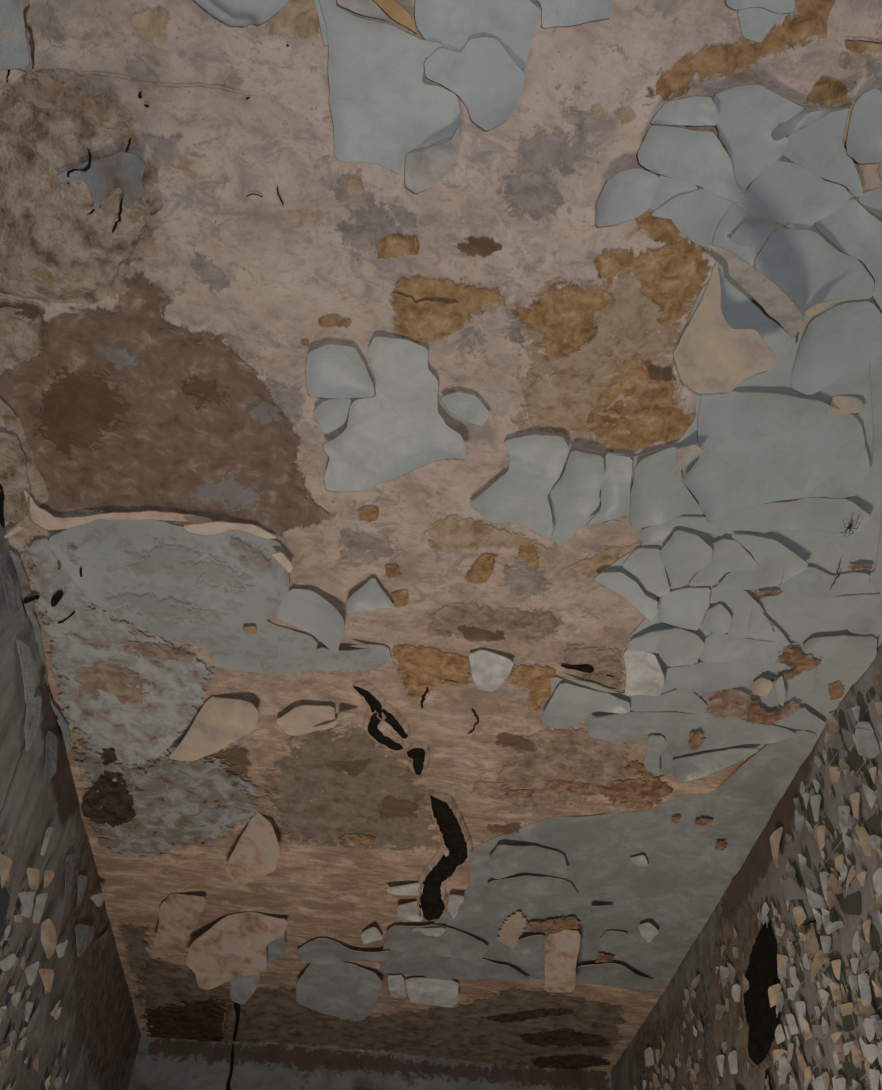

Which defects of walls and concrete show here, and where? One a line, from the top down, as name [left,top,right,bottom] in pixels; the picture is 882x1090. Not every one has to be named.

leakage [329,169,421,255]
peeling [314,0,613,193]
leakage [498,86,598,222]
rust [646,0,835,100]
rust [807,77,848,108]
rust [389,212,711,455]
peeling [0,270,394,886]
leakage [337,529,398,561]
peeling [154,84,882,1090]
crack [353,679,473,921]
crack [222,1002,240,1090]
crack [743,921,781,1090]